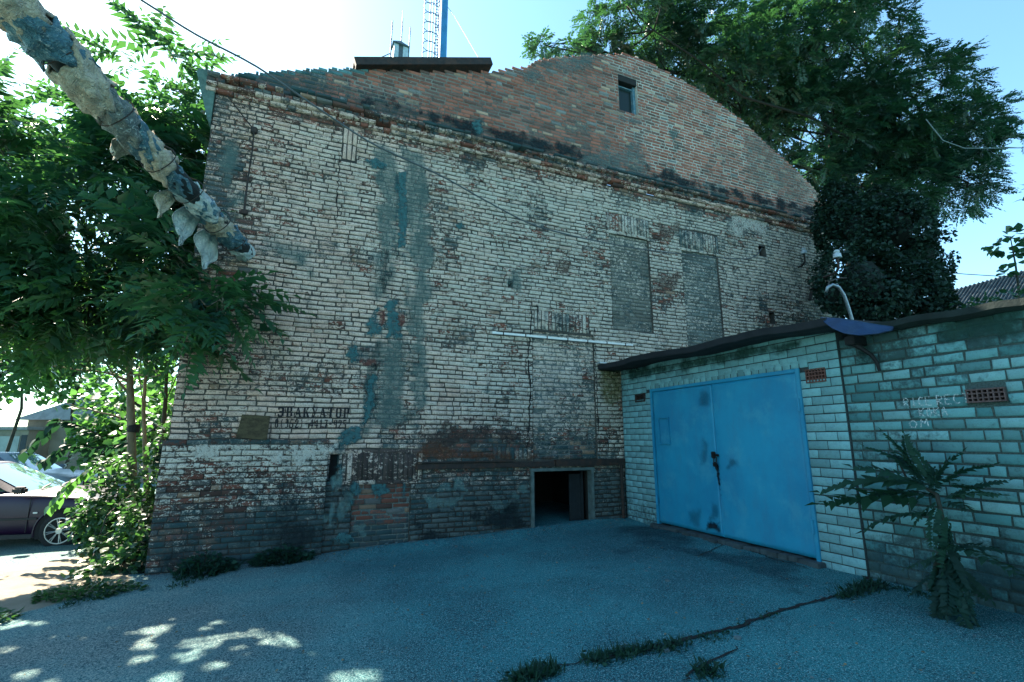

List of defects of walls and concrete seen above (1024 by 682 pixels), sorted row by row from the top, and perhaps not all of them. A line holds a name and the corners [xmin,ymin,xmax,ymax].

water stain [362,98,583,157]
water stain [646,164,814,215]
water stain [360,146,434,434]
crack [526,298,600,457]